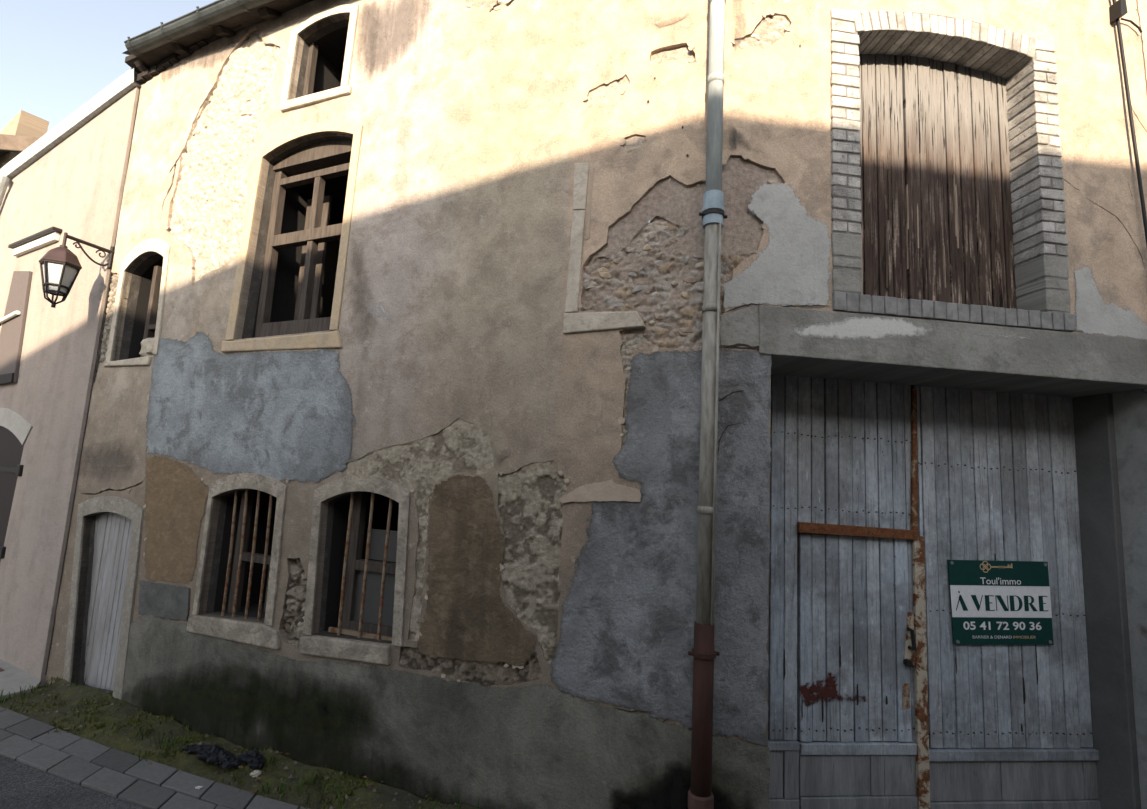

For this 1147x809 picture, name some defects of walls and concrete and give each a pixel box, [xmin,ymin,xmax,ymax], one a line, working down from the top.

flaking render [164,26,281,283]
flaking render [458,0,514,12]
flaking render [583,75,630,107]
flaking render [651,45,696,81]
flaking render [731,12,791,49]
flaking render [720,153,792,325]
flaking render [578,177,706,447]
flaking render [342,419,570,686]
damp [126,668,463,804]